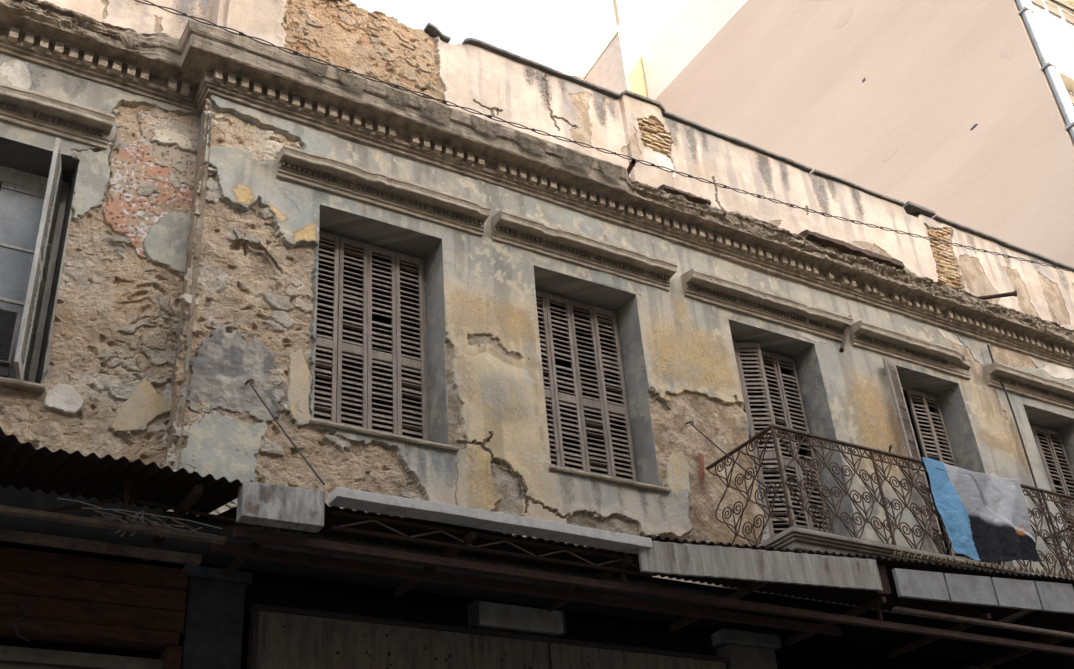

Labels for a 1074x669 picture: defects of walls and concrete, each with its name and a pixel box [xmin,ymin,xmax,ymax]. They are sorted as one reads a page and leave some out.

flaking render [283,0,444,105]
crack [543,75,577,131]
flaking render [621,119,671,157]
spalling [0,98,425,514]
flaking render [926,227,1000,303]
peeling [1003,266,1070,325]
spalling [167,498,238,517]
crack [455,434,566,518]
spalling [567,512,642,536]
spalling [648,391,765,546]